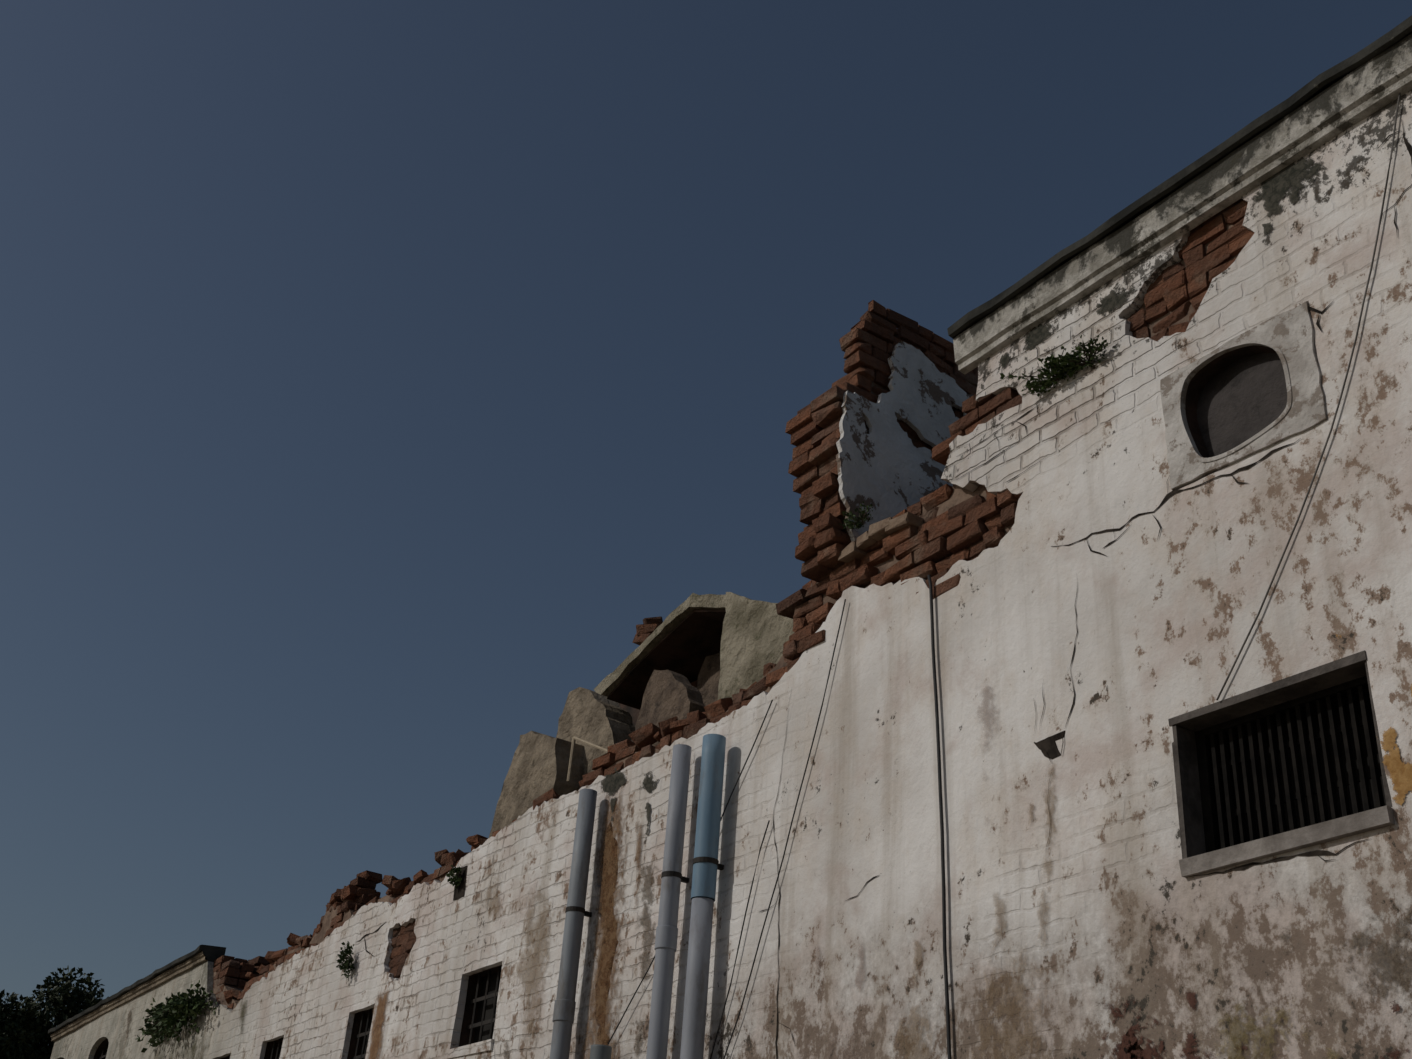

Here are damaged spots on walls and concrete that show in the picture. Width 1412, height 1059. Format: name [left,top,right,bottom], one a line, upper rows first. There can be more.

leakage [1253,154,1326,237]
crack [1379,119,1412,232]
spalling [1127,198,1255,341]
spalling [932,387,1022,466]
crack [1051,438,1301,556]
spalling [776,483,1022,672]
crack [1033,593,1078,731]
peeling [1380,727,1412,805]
spalling [388,920,416,979]
leakage [1341,910,1412,1000]
peeling [1100,999,1248,1059]
peeling [1186,992,1197,1010]